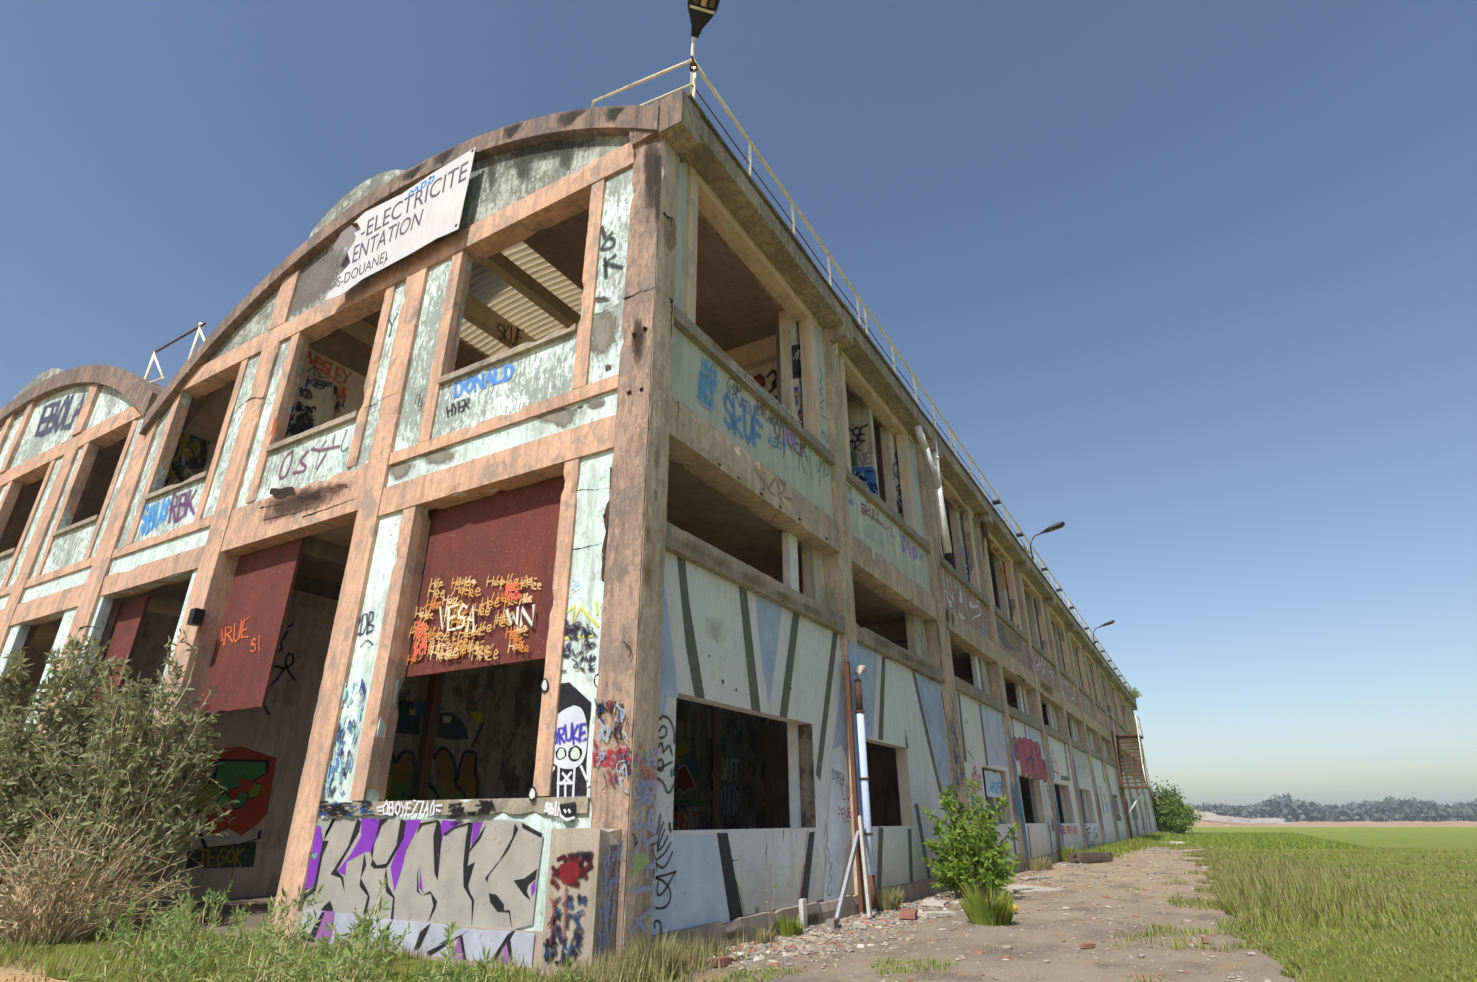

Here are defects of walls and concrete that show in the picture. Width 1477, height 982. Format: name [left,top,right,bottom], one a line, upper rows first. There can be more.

leakage [488,110,595,189]
leakage [607,107,624,120]
peeling [591,296,647,371]